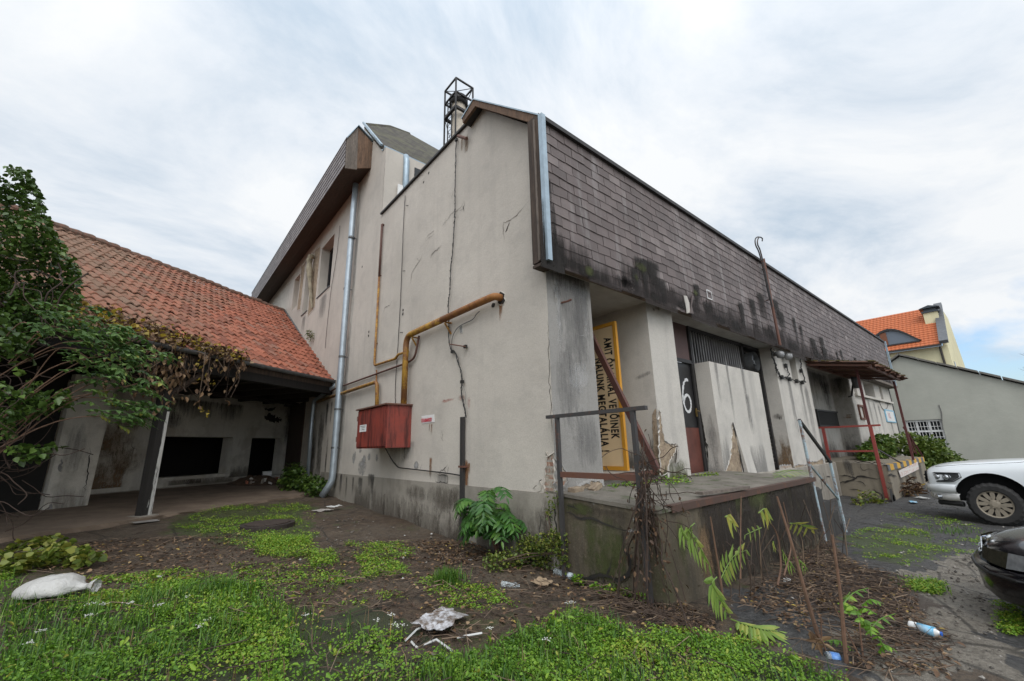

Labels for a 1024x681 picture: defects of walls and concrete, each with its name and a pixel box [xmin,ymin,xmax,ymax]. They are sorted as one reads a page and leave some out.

leakage [541,230,565,274]
corrosion [439,293,503,323]
leakage [579,258,839,361]
spalling [534,451,605,493]
flaking render [652,408,679,476]
flaking render [726,424,757,473]